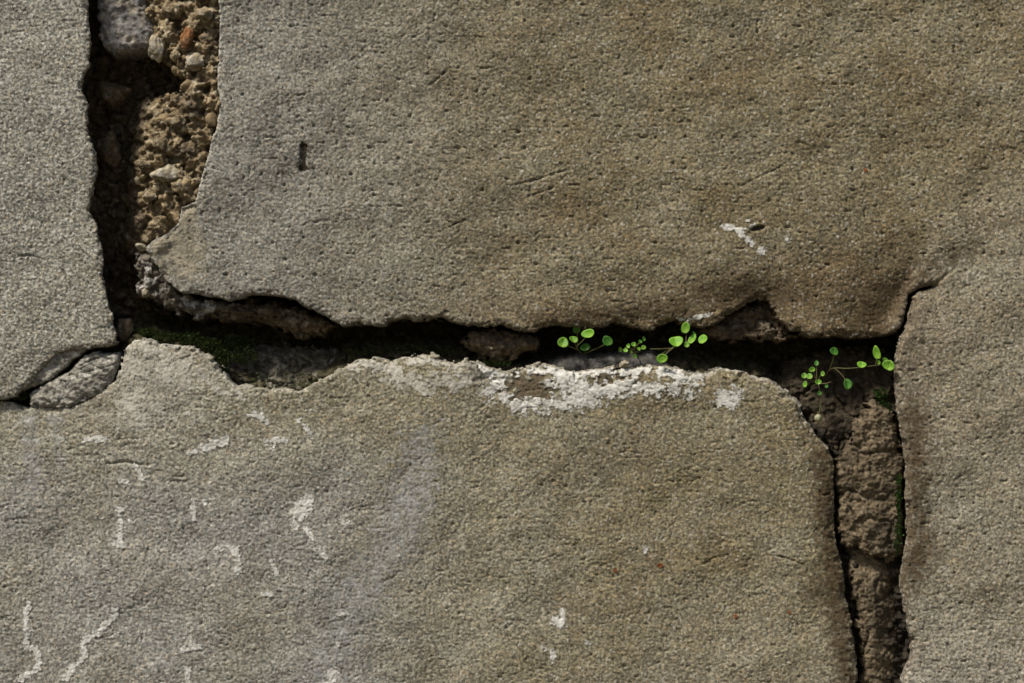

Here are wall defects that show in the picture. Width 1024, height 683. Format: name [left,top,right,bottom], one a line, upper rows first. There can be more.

spalling [104,0,243,323]
crack [0,0,902,407]
spalling [497,371,556,401]
damp [343,356,745,418]
spalling [694,300,799,346]
crack [804,417,911,683]